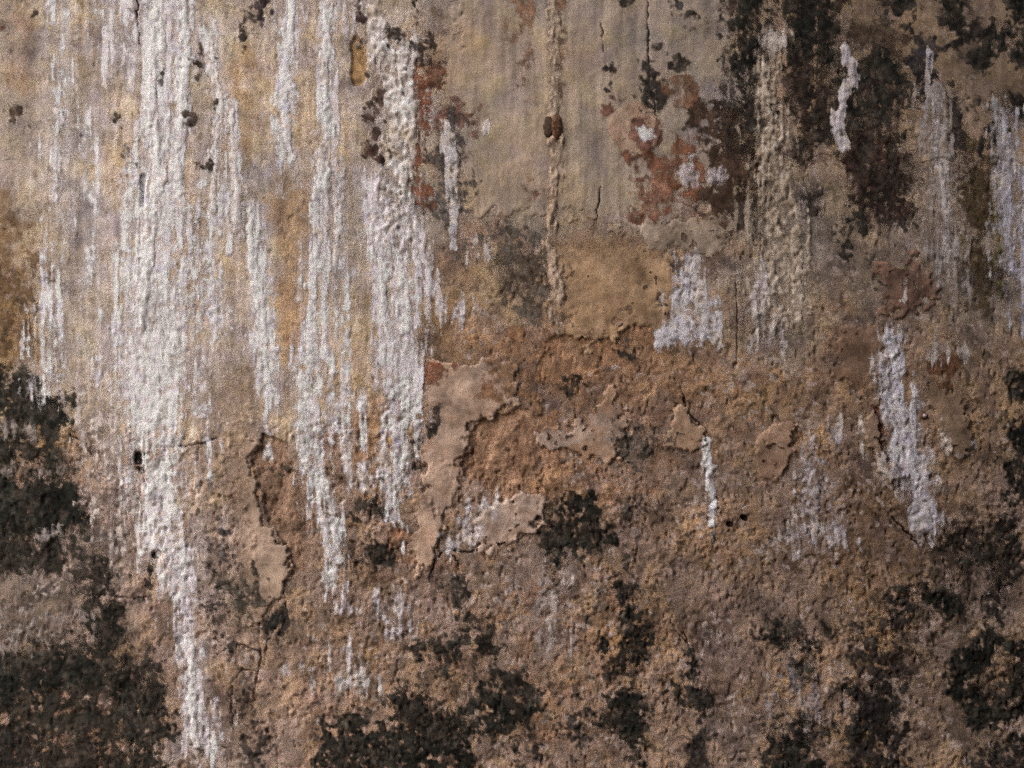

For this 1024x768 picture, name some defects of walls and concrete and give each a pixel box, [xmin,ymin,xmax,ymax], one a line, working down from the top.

corrosion [402,56,483,214]
corrosion [600,93,641,116]
corrosion [619,117,708,225]
corrosion [657,74,703,108]
leakage [667,0,1024,369]
leakage [0,0,725,768]
flaking render [387,355,633,580]
leakage [743,322,1024,768]
crack [189,622,274,748]